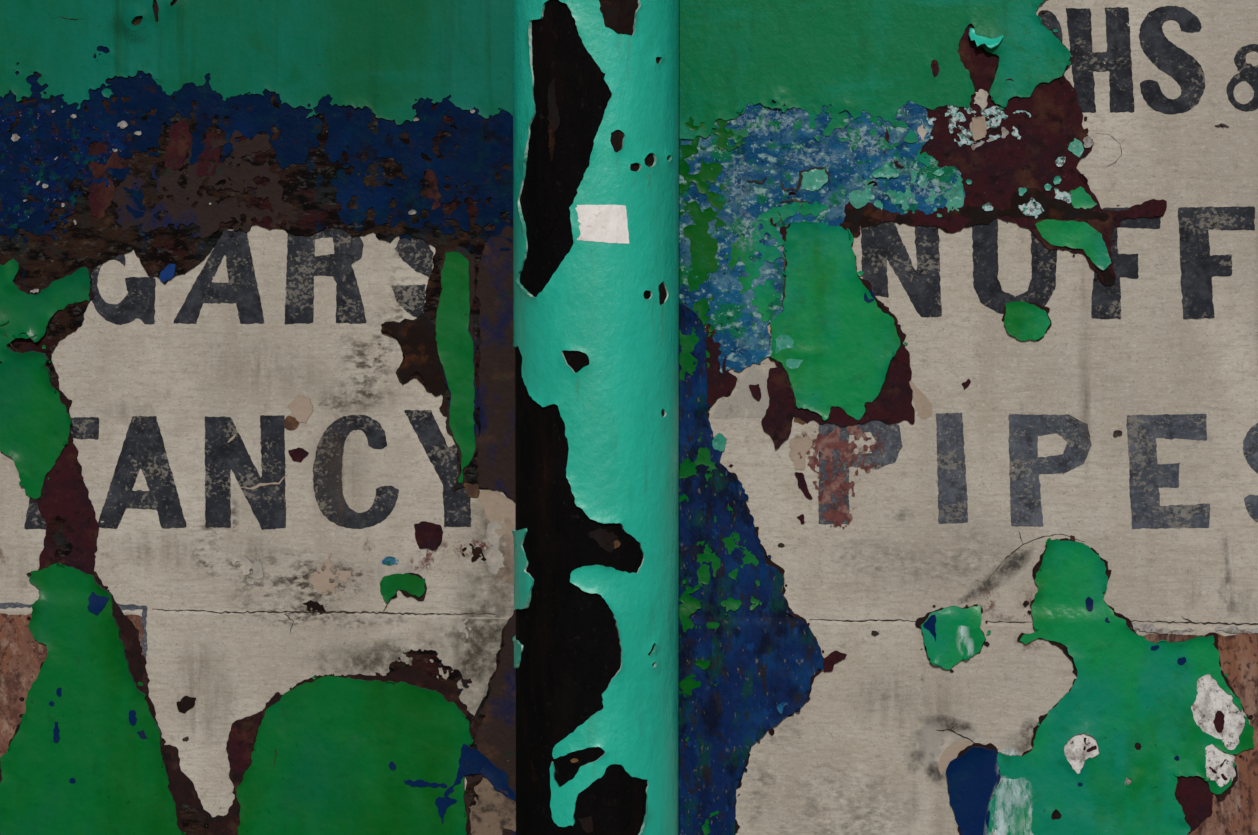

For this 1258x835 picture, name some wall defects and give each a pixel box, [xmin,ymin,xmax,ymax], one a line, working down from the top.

peeling [0,0,648,835]
peeling [630,0,1167,835]
peeling [910,535,1255,835]